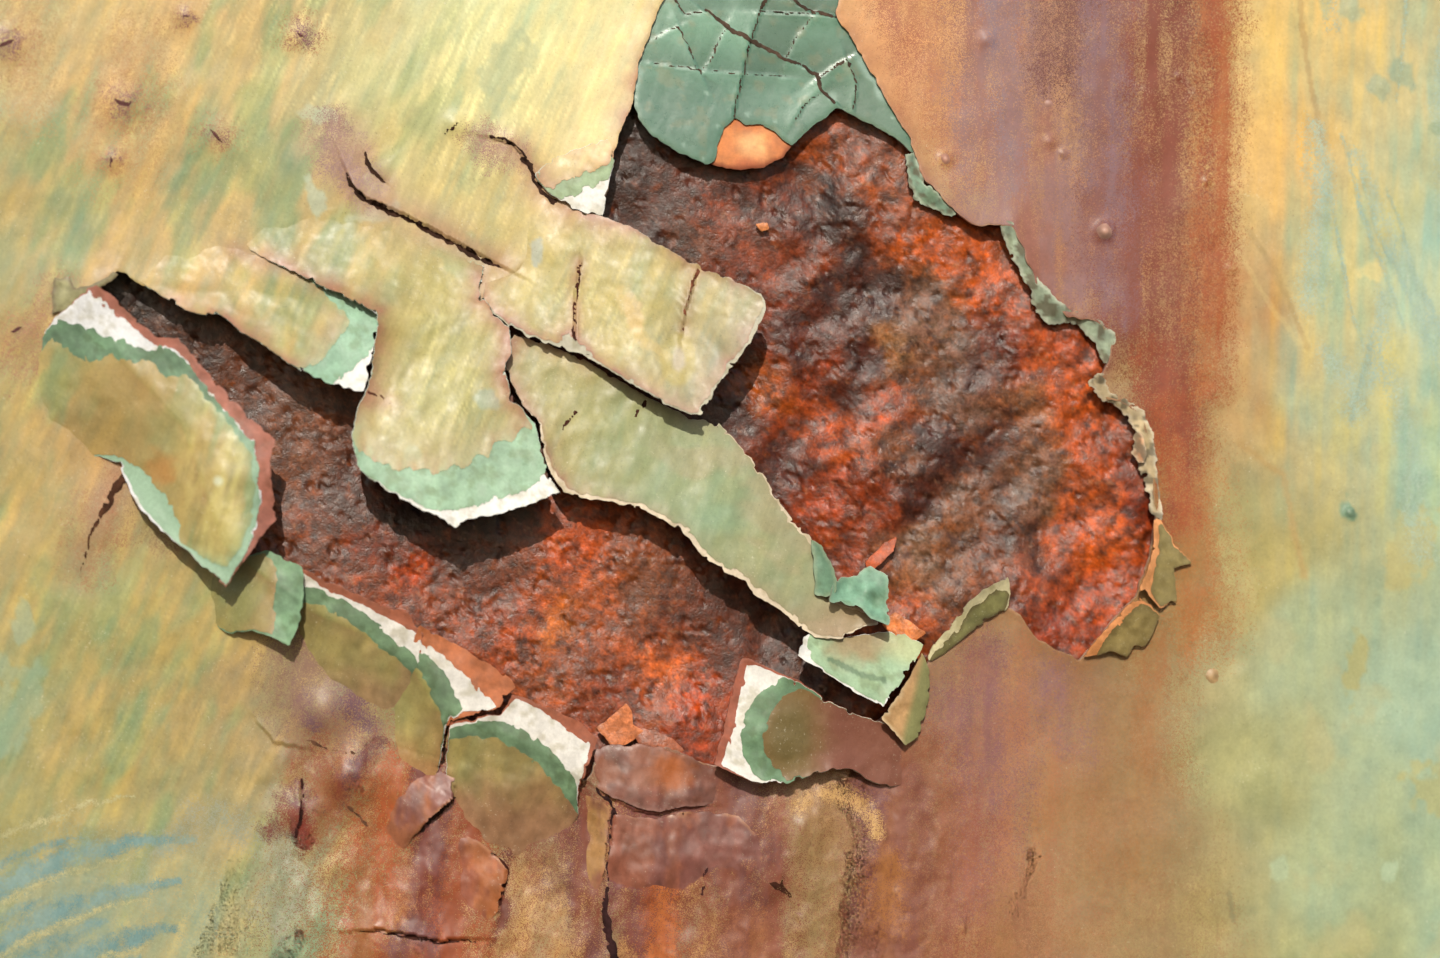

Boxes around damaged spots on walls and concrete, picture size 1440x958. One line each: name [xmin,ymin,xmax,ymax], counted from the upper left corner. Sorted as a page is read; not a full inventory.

rust [0,0,248,218]
crack [346,151,501,268]
crack [489,135,558,205]
crack [655,0,857,119]
rust [101,0,1263,765]
peeling [1000,221,1192,657]
crack [80,474,127,578]
rust [51,458,189,595]
peeling [38,140,1010,919]
crack [596,787,619,958]
rust [243,622,1051,958]